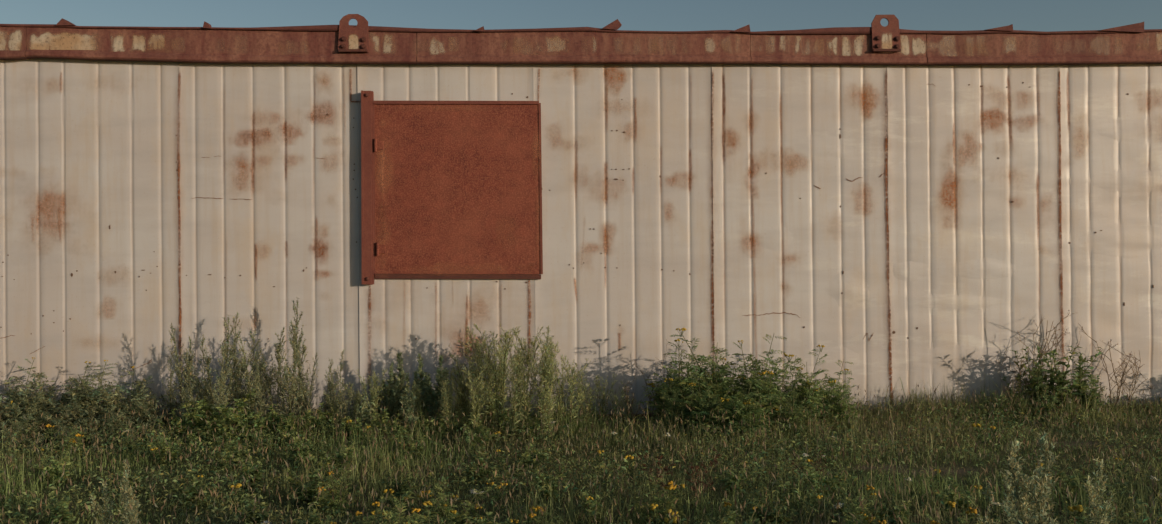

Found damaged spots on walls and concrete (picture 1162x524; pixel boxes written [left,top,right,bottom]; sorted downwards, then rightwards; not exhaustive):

rust [861,89,875,116]
rust [981,111,1012,138]
rust [239,123,291,183]
rust [942,179,957,208]